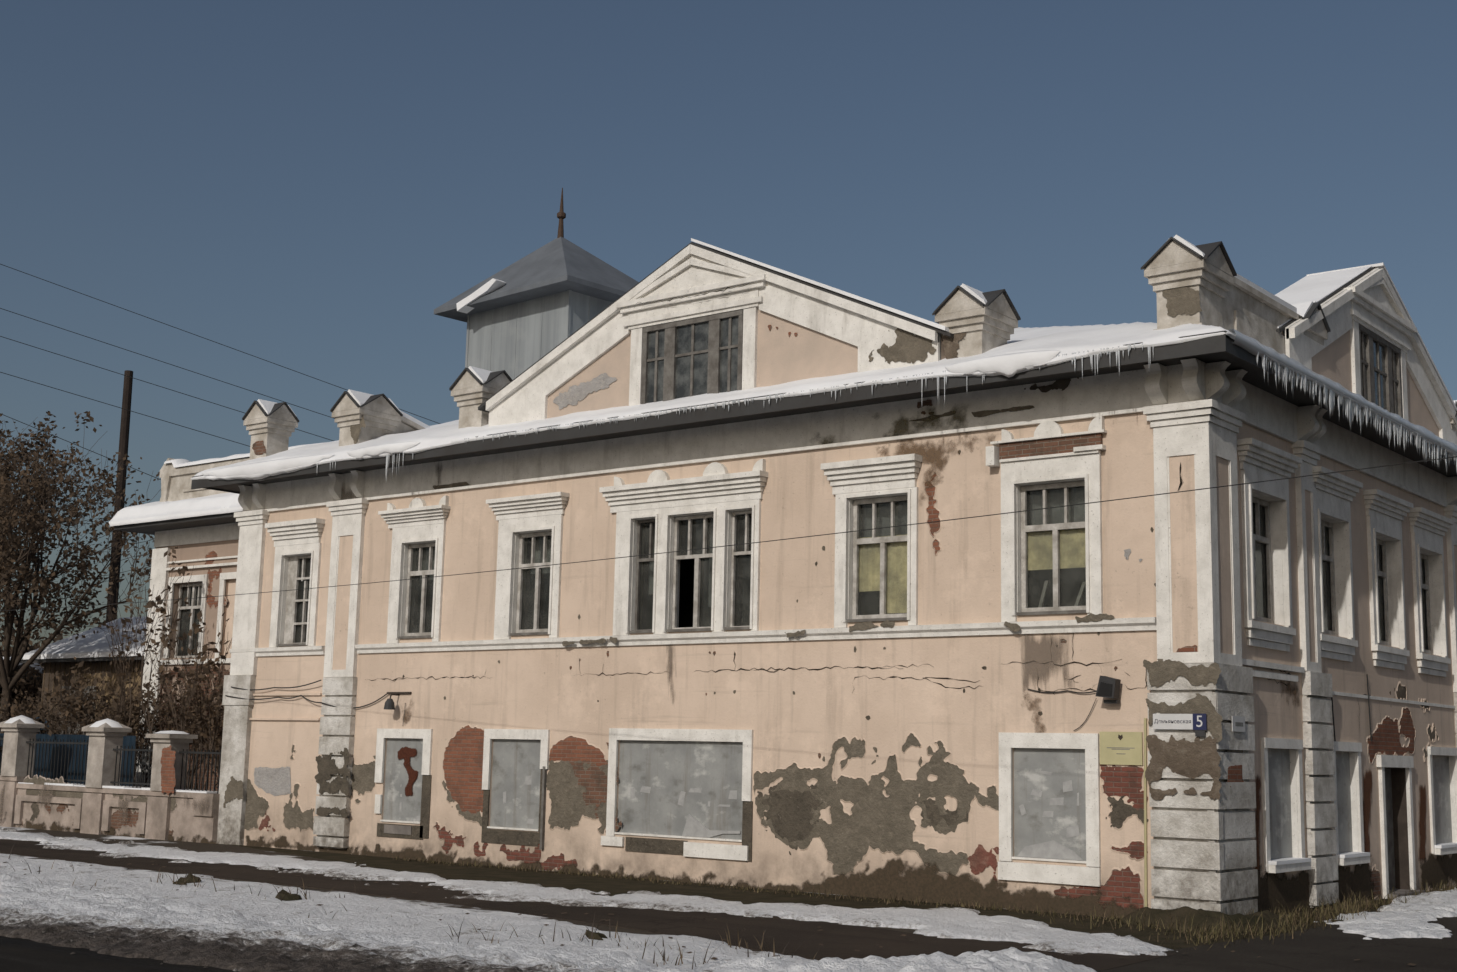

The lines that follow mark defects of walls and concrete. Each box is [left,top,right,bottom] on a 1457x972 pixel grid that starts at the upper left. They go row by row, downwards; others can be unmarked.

flaking render [1162,286,1203,317]
flaking render [868,328,966,364]
peeling [924,472,942,556]
peeling [15,774,93,828]
flaking render [111,658,376,841]
flaking render [377,724,688,871]
crack [580,633,1147,694]
peeling [741,731,999,881]
water stain [1023,635,1066,733]
flaking render [1054,645,1244,909]
flaking render [1366,682,1439,765]